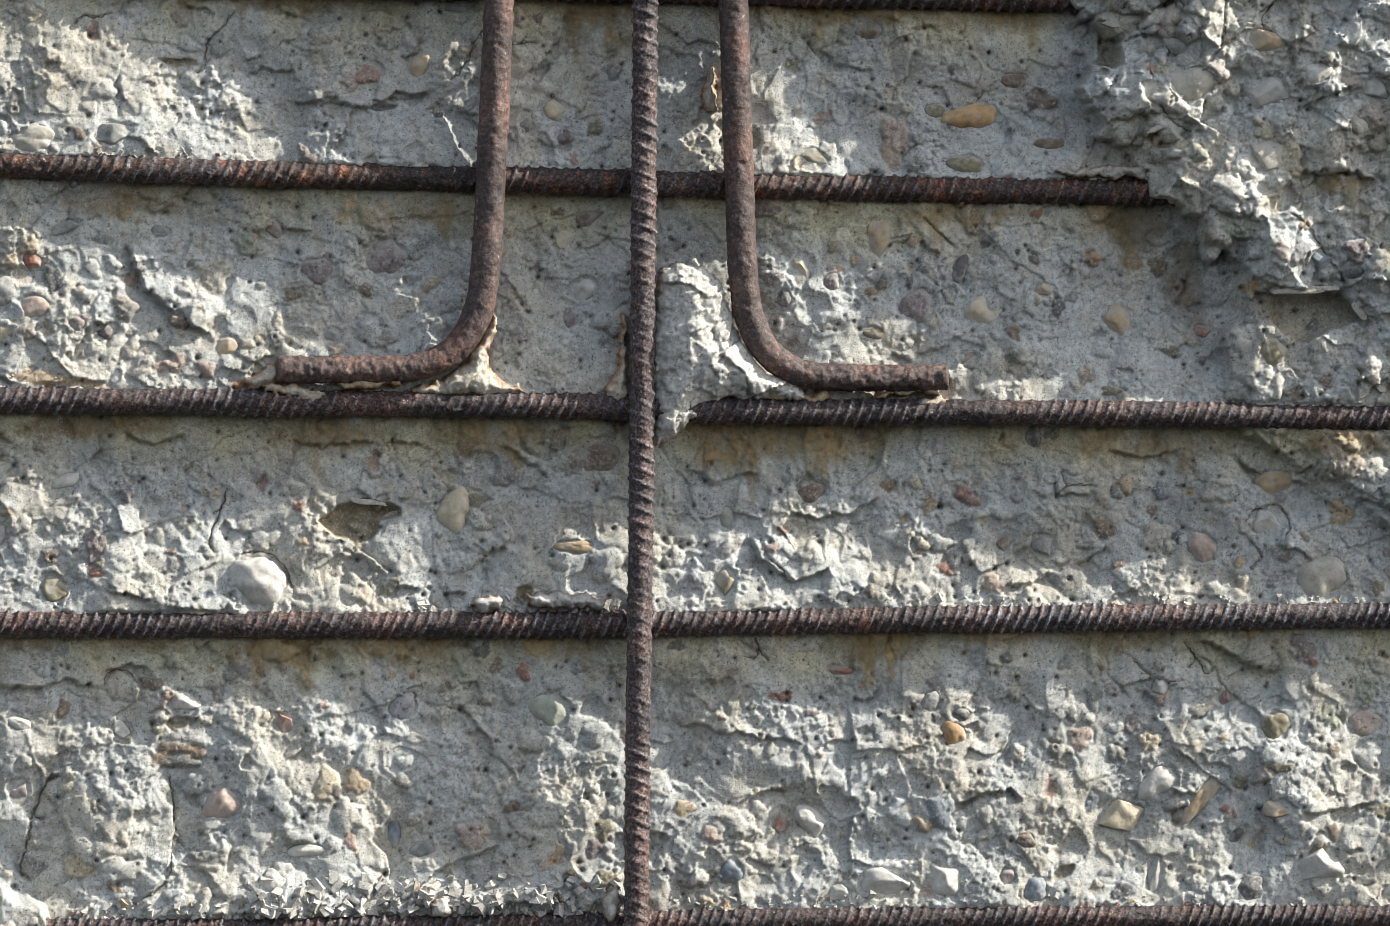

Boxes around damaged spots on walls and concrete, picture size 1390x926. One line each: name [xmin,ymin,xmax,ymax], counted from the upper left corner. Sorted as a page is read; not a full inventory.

rust [766,6,926,35]
spalling [157,54,199,69]
spalling [0,152,476,193]
spalling [275,0,632,384]
spalling [0,385,630,421]
spalling [622,0,1390,926]
spalling [316,497,404,548]
spalling [0,609,627,641]
rust [233,637,312,686]
rust [522,637,585,663]
spalling [163,715,206,734]
spalling [46,911,624,926]